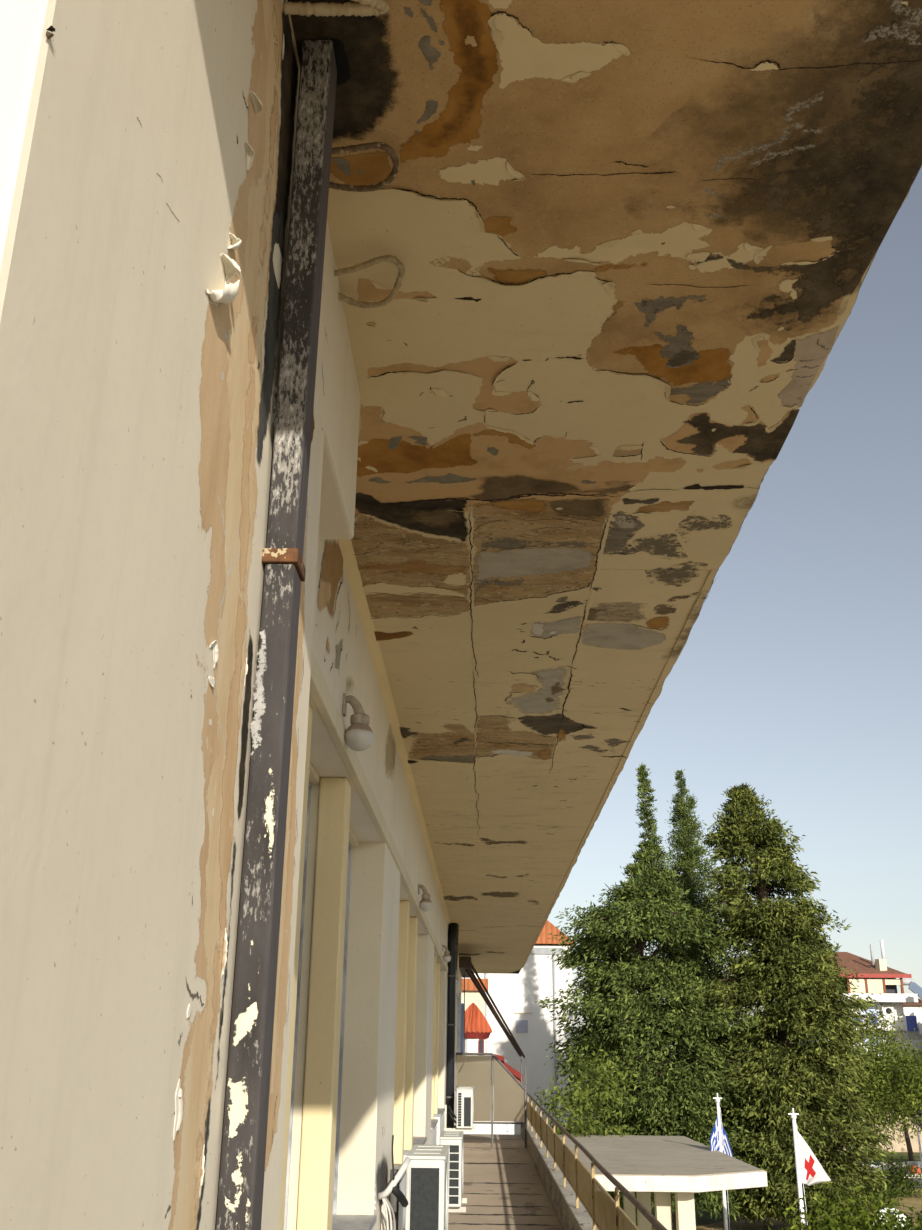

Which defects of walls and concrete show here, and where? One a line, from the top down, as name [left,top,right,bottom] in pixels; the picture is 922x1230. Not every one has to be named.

leakage [257,0,498,464]
peeling [330,0,908,425]
crack [693,58,922,70]
leakage [696,0,922,331]
leakage [196,1099,211,1230]
leakage [216,926,230,1081]
peeling [168,0,285,1230]
leakage [238,630,253,819]
peeling [264,582,317,1171]
peeling [408,714,629,764]
crack [454,507,639,835]
peeling [351,356,759,641]